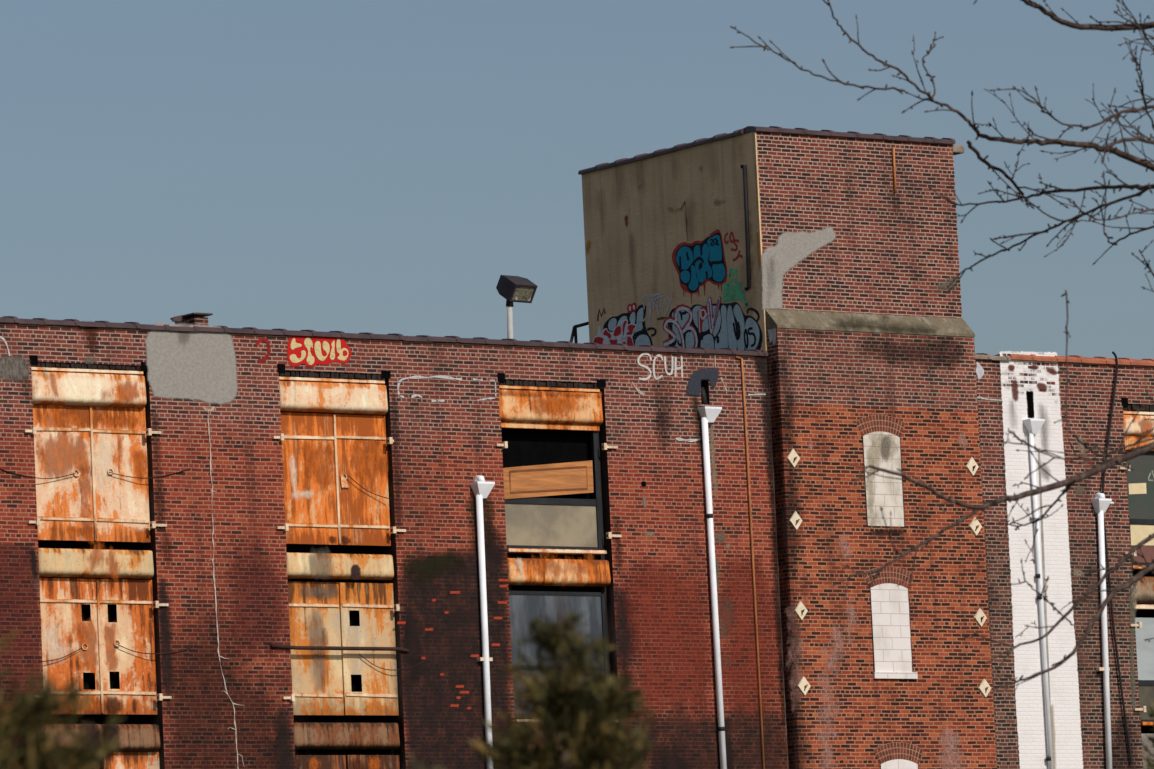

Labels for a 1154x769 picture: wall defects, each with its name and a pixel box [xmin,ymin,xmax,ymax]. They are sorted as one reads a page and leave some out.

corrosion [503,391,601,414]
peeling [1009,365,1018,400]
peeling [1031,365,1056,391]
corrosion [39,373,145,576]
corrosion [291,444,333,498]
corrosion [351,440,388,491]
corrosion [351,565,361,579]
corrosion [78,621,117,670]
corrosion [61,697,136,749]
corrosion [353,757,380,769]